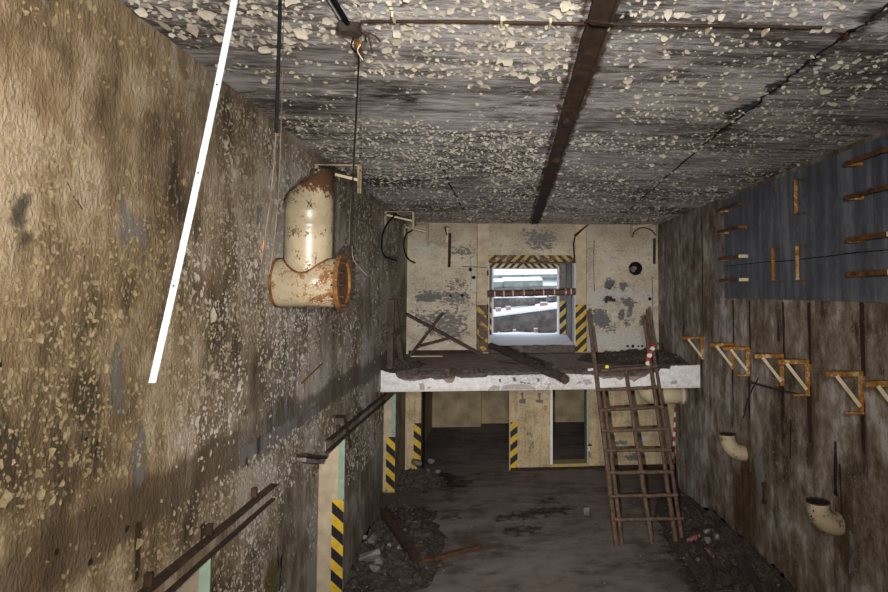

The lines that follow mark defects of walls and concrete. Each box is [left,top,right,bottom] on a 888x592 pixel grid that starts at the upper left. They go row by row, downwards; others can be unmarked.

peeling [280,71,314,106]
peeling [128,0,584,100]
peeling [603,0,725,96]
peeling [522,51,888,252]
peeling [710,28,759,56]
crack [614,3,888,225]
peeling [756,0,859,34]
peeling [586,278,655,352]